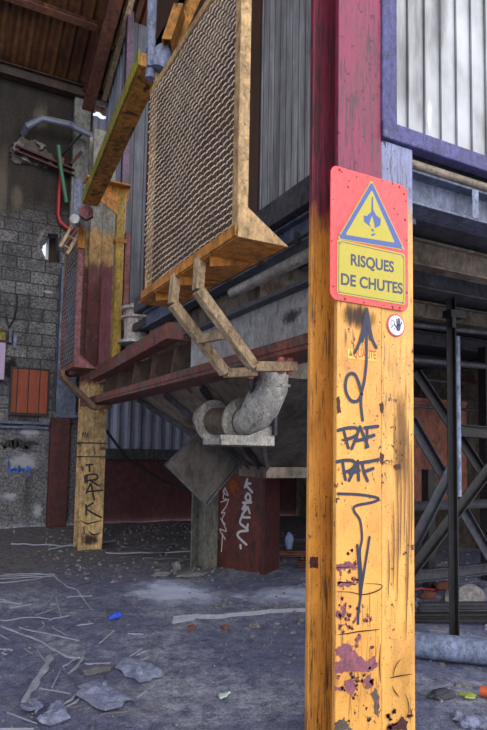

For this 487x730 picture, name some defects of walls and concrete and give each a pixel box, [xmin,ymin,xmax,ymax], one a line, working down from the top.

spalling [8,136,57,171]
peeling [336,549,359,587]
peeling [334,596,414,730]